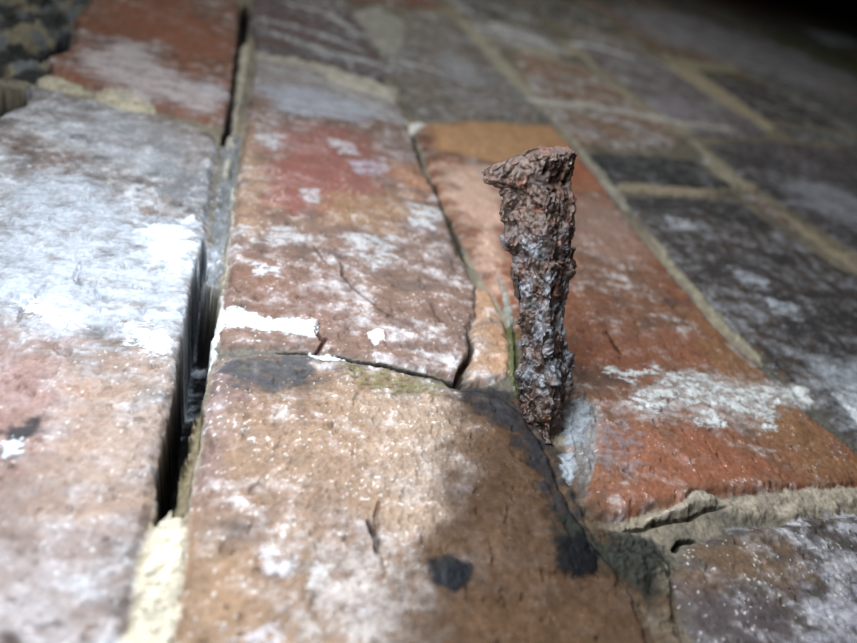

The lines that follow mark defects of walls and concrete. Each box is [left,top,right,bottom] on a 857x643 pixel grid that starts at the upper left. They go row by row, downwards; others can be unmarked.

damp [0,169,219,354]
crack [312,245,394,317]
rust [510,270,520,300]
crack [275,306,475,390]
rust [540,328,559,365]
damp [603,365,814,432]
damp [821,365,857,425]
damp [308,385,672,643]
damp [262,549,295,575]
damp [245,627,279,643]